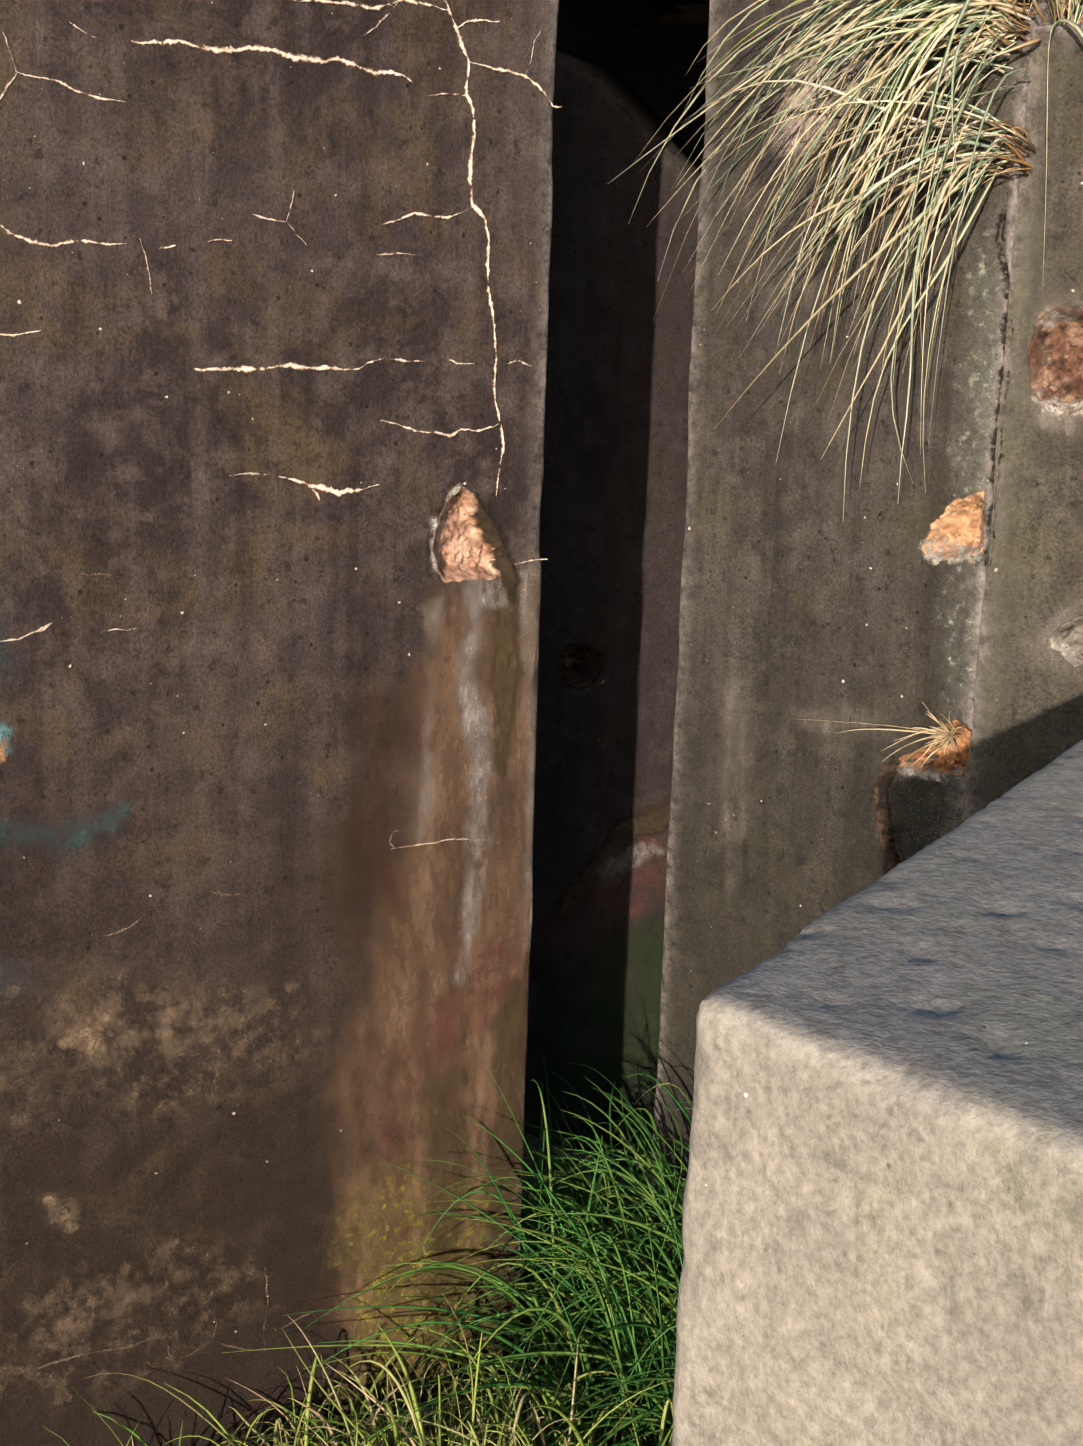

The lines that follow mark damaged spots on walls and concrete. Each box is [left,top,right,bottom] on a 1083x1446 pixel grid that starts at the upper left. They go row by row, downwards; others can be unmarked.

crack [0,32,125,102]
crack [0,192,307,297]
crack [131,0,562,495]
crack [0,329,41,337]
spalling [1028,306,1083,414]
crack [229,472,380,501]
spalling [431,486,519,601]
spalling [922,491,985,564]
spalling [1048,615,1083,668]